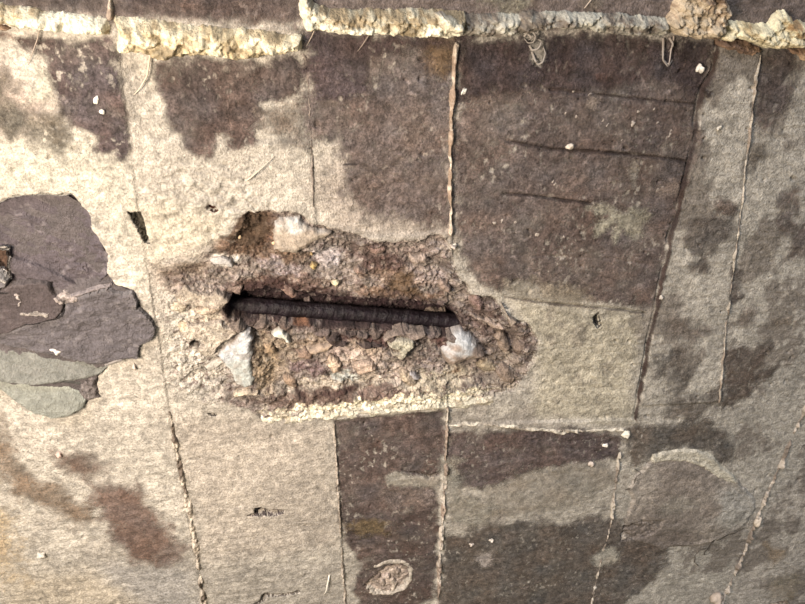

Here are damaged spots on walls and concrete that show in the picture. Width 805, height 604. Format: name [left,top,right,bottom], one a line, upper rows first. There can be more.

damp [26,0,99,15]
damp [114,0,298,30]
damp [0,32,131,161]
spalling [0,210,538,424]
damp [154,30,714,310]
damp [684,200,738,273]
damp [729,267,744,304]
damp [776,189,805,260]
damp [0,434,185,567]
damp [335,341,780,604]